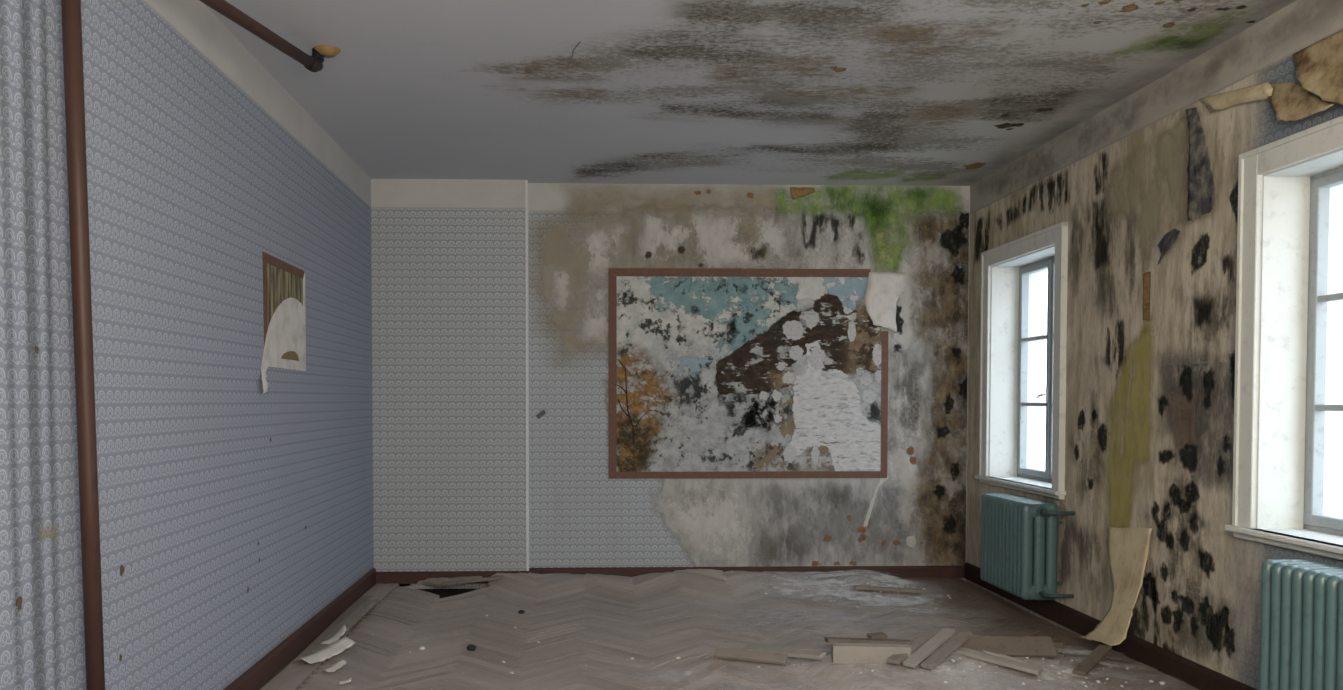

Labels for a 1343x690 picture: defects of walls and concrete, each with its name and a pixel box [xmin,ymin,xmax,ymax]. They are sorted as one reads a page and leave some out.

mould [626,0,947,79]
mould [666,92,830,119]
mould [721,86,963,156]
flaking render [612,187,969,567]
water stain [540,172,1067,566]
water stain [1071,154,1238,657]
water stain [1061,520,1098,581]
peeling [1077,527,1152,646]